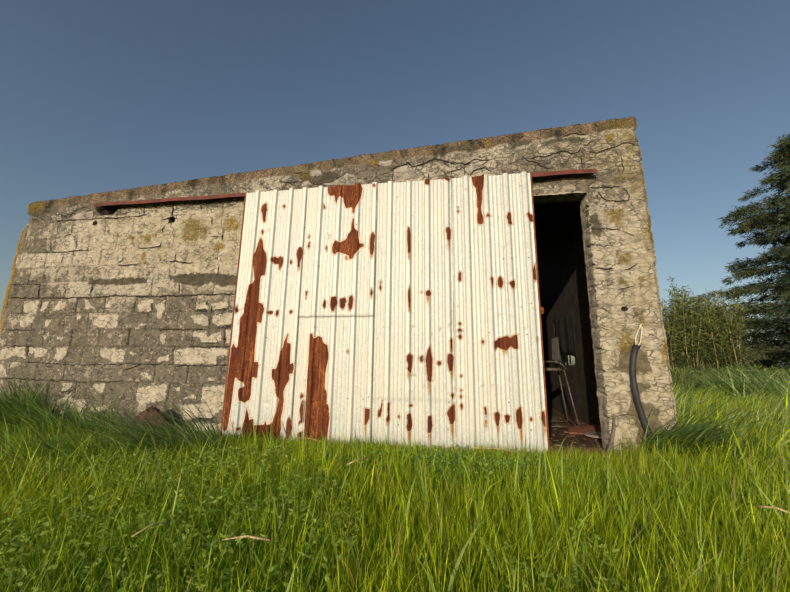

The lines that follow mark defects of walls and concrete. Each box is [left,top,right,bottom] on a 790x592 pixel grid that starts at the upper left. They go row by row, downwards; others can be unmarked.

crack [392,158,490,180]
corrosion [323,183,376,260]
corrosion [470,174,491,226]
crack [524,133,645,289]
leakage [88,277,147,286]
leakage [169,272,236,287]
corrosion [222,202,331,443]
corrosion [322,295,353,312]
corrosion [406,322,463,393]
corrosion [481,334,519,353]
corrosion [447,389,463,436]